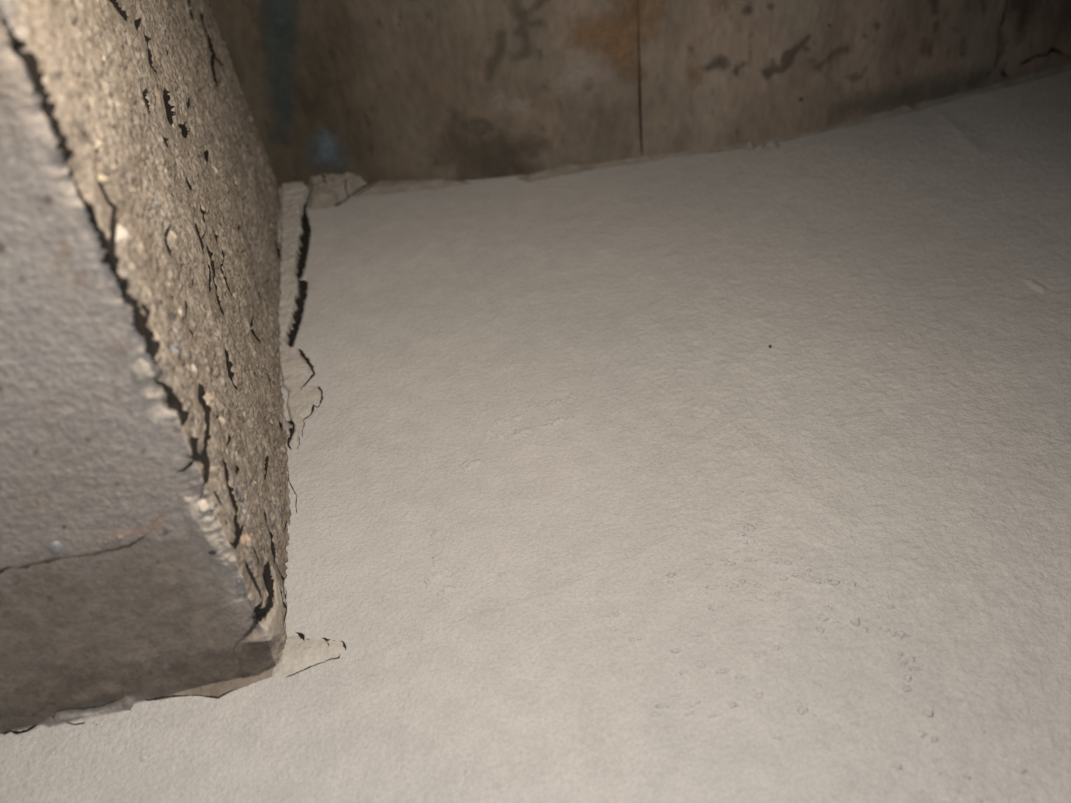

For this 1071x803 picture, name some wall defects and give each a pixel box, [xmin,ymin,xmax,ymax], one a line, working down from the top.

water stain [764,37,809,78]
flaking render [115,224,129,246]
flaking render [168,231,178,251]
flaking render [153,328,181,356]
crack [0,0,368,677]
spalling [130,358,161,404]
flaking render [203,392,216,407]
spalling [182,496,252,569]
spalling [150,641,275,701]